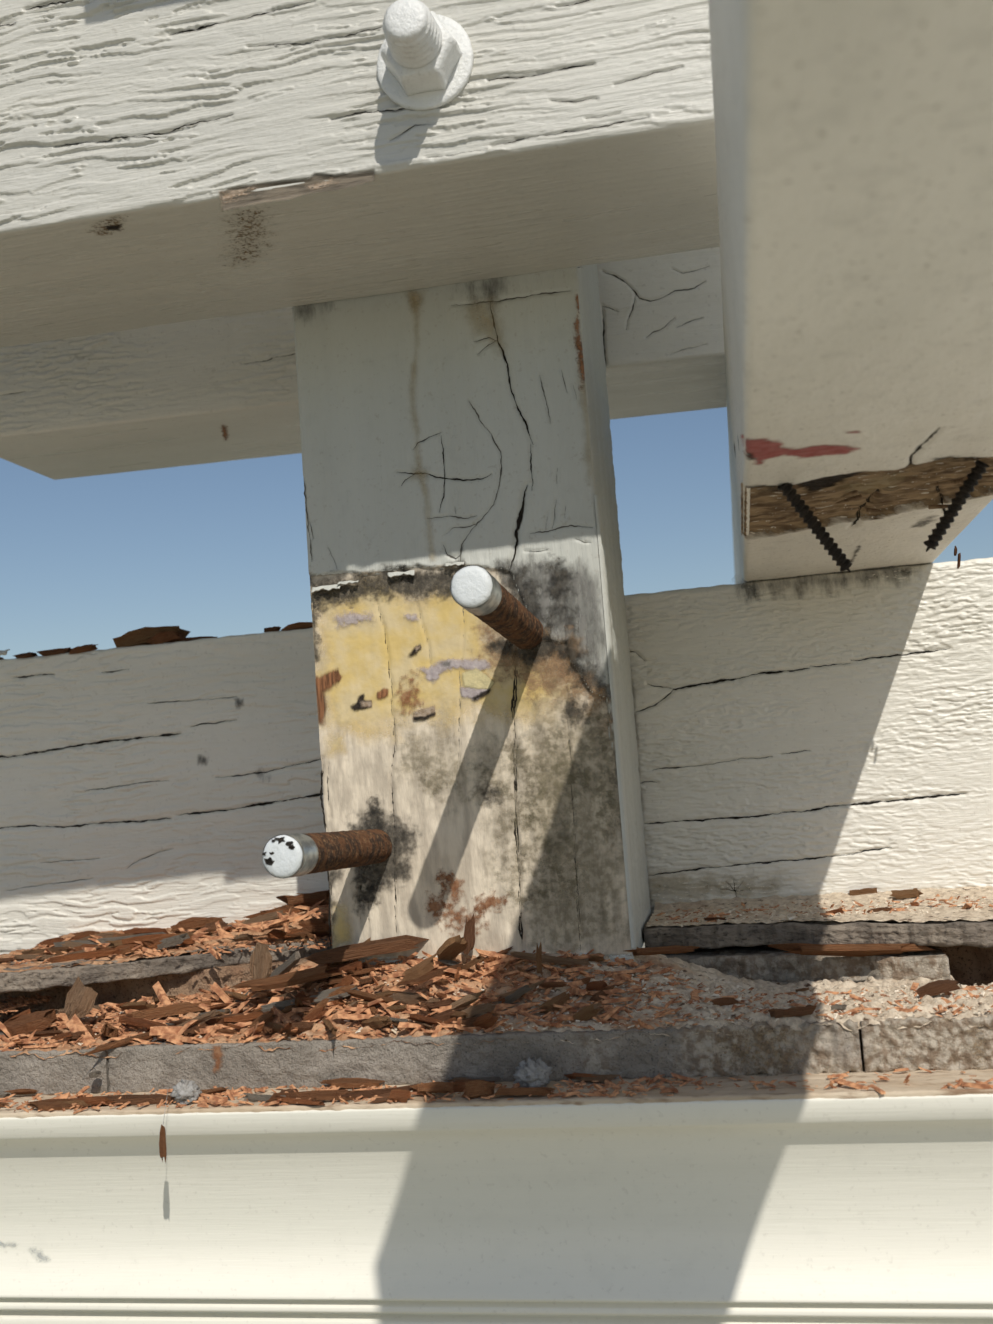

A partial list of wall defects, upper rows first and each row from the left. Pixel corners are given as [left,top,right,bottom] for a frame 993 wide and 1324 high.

crack [172,1,383,47]
crack [332,64,683,158]
crack [399,302,593,581]
peeling [741,431,860,464]
spalling [741,457,993,536]
crack [634,648,950,713]
crack [0,697,234,758]
water stain [310,562,615,947]
peeling [310,495,637,960]
crack [0,759,329,867]
crack [648,794,959,824]
rust [428,873,506,934]